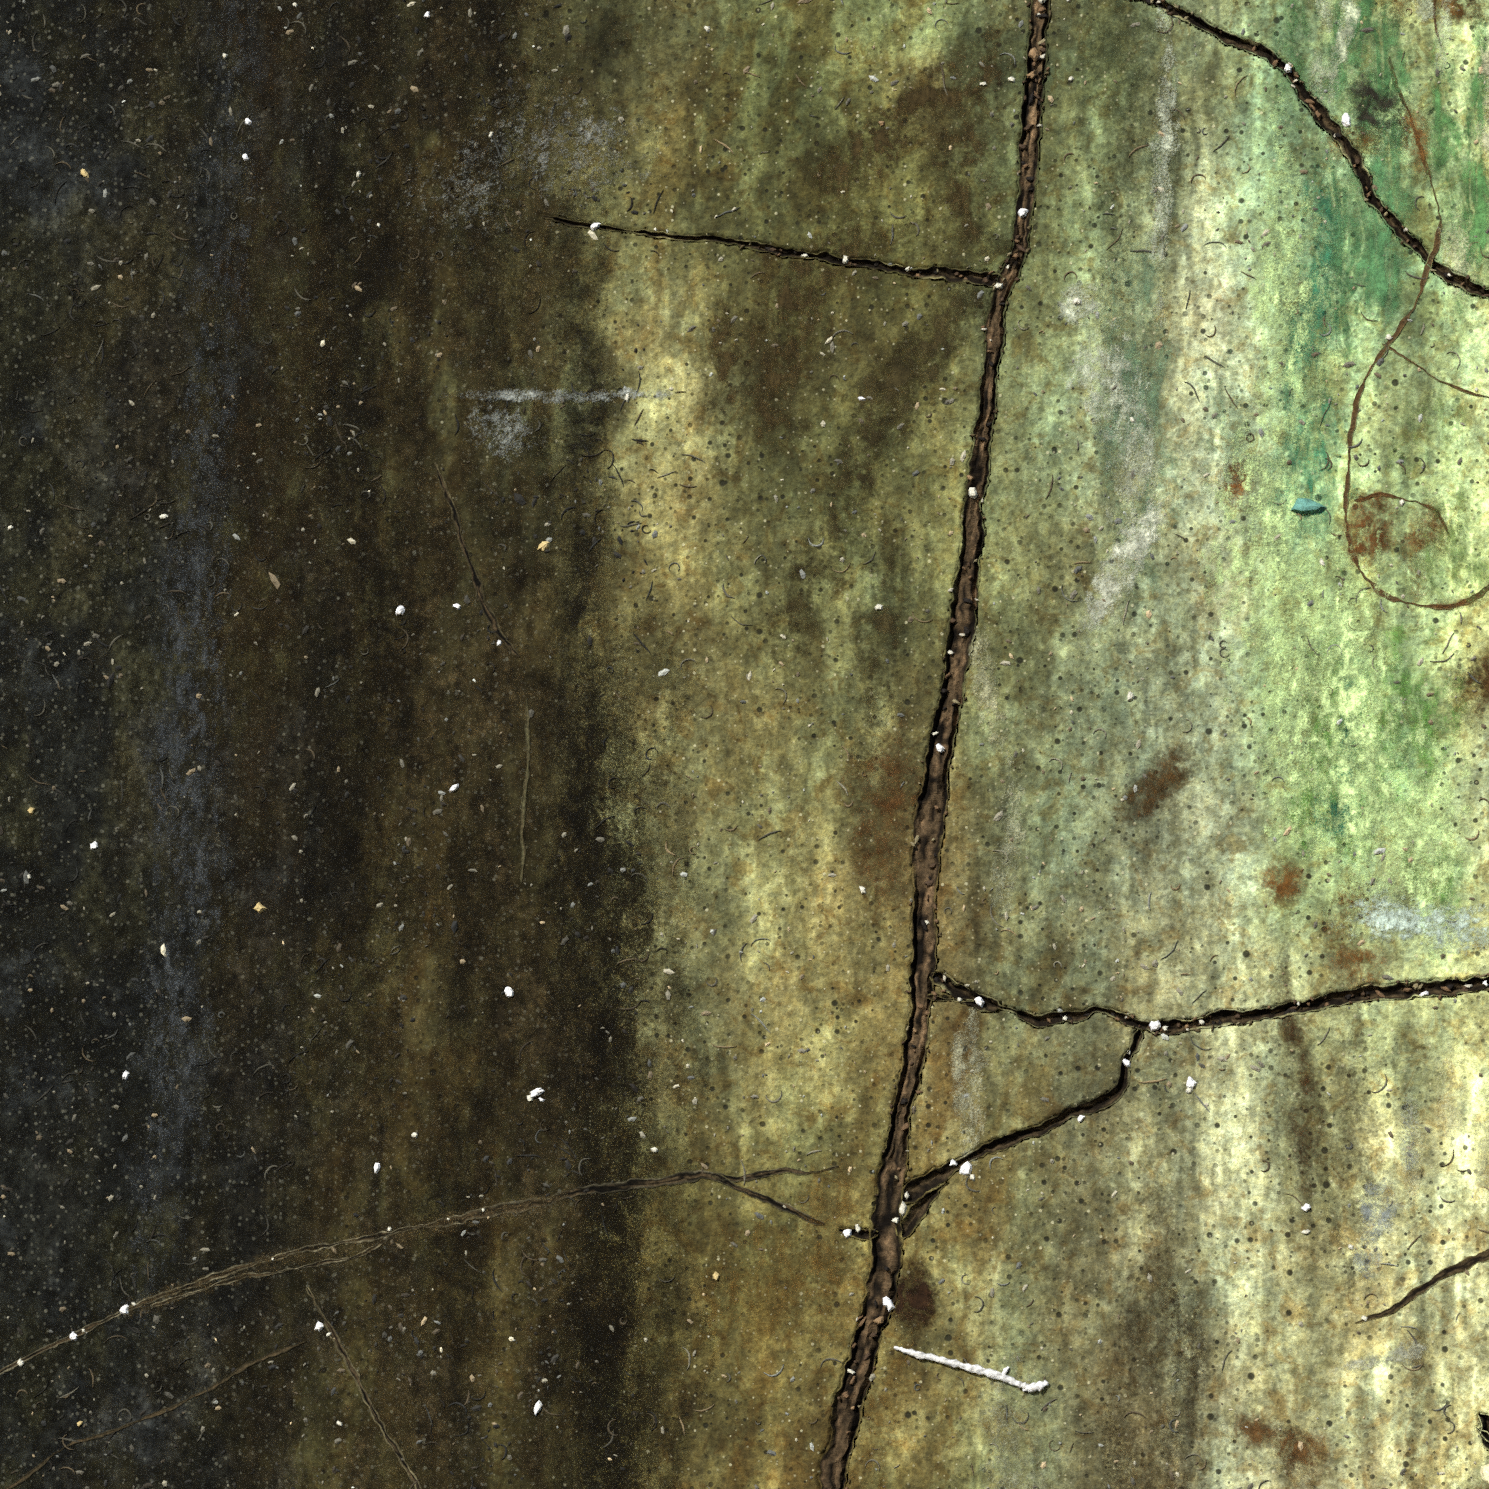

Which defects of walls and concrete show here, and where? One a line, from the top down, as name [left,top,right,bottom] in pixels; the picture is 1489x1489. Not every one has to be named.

damp [0,0,666,1489]
crack [542,0,1489,1489]
rust [1127,746,1194,820]
rust [1347,495,1446,561]